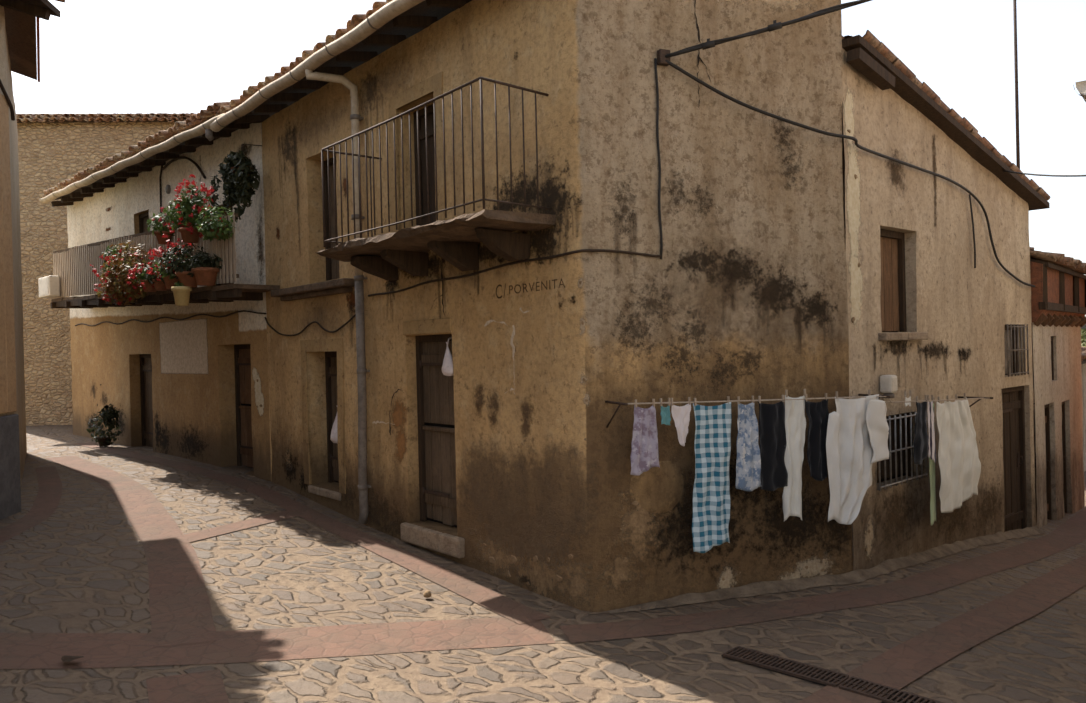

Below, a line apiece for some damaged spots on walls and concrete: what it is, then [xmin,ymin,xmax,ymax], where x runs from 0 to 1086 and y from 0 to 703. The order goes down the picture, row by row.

crack [694,0,711,103]
leakage [493,165,581,264]
leakage [667,247,838,328]
peeling [252,367,264,416]
spalling [392,401,408,462]
leakage [475,385,499,425]
leakage [521,401,533,437]